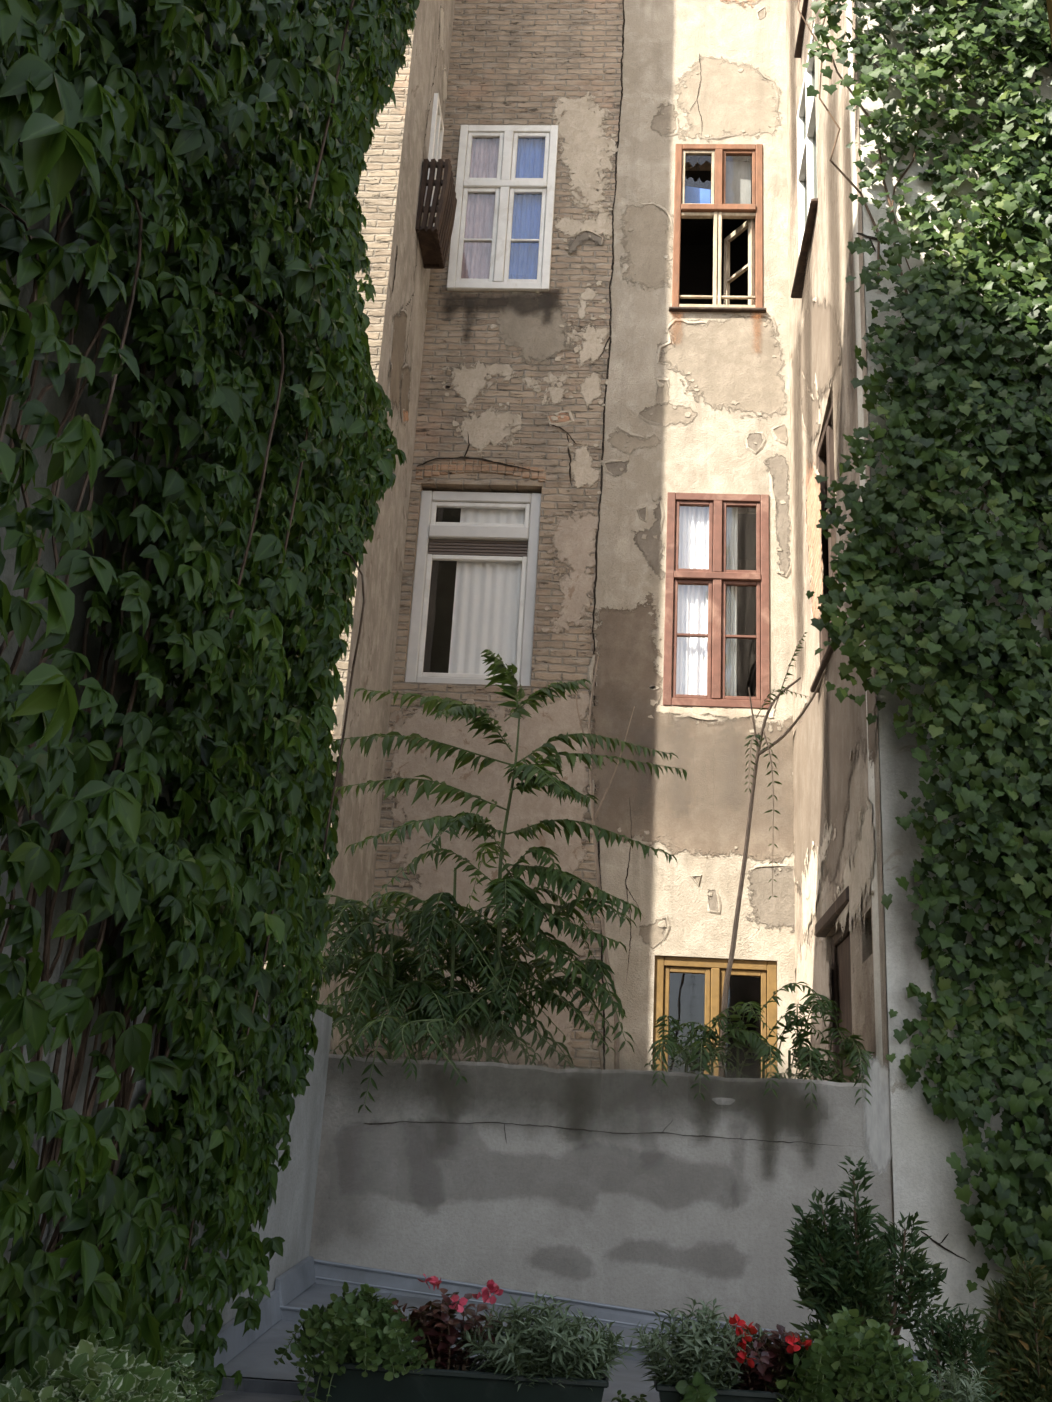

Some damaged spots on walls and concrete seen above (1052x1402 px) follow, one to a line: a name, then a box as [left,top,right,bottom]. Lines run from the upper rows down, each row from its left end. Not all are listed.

flaking render [720,0,767,20]
spalling [650,55,782,143]
spalling [563,229,605,253]
spalling [593,295,843,619]
flaking render [587,496,878,1046]
crack [364,1121,859,1147]